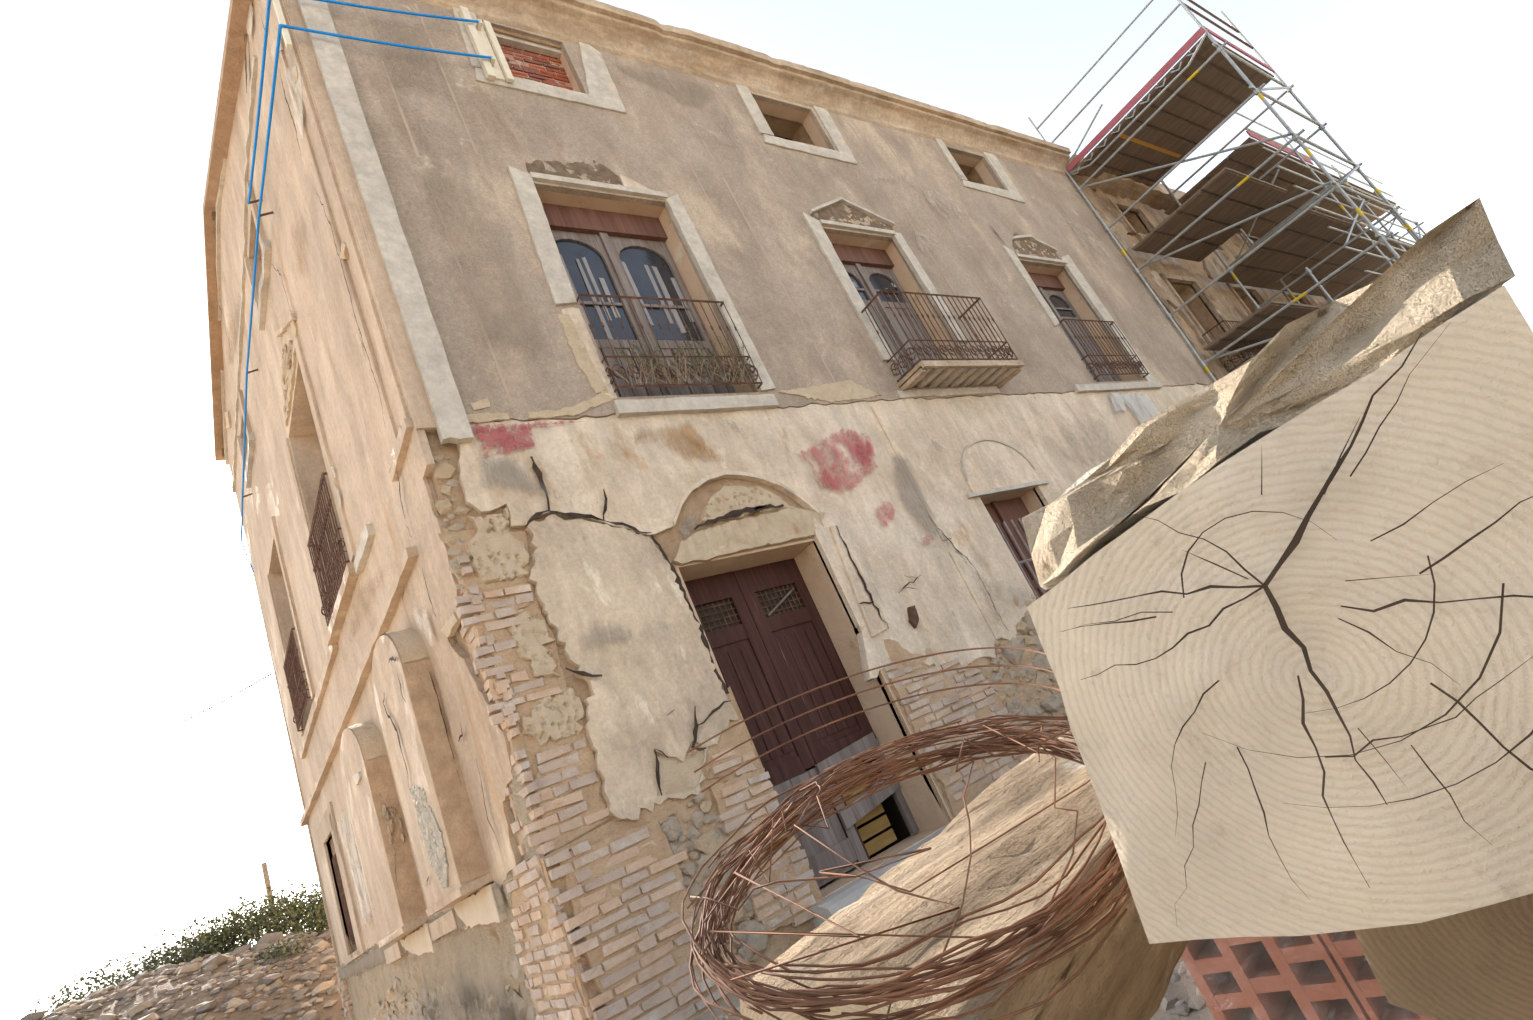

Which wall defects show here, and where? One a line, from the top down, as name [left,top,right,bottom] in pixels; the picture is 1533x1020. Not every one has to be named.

spalling [425,455,631,855]
crack [514,441,729,694]
crack [694,504,784,530]
spalling [382,786,449,888]